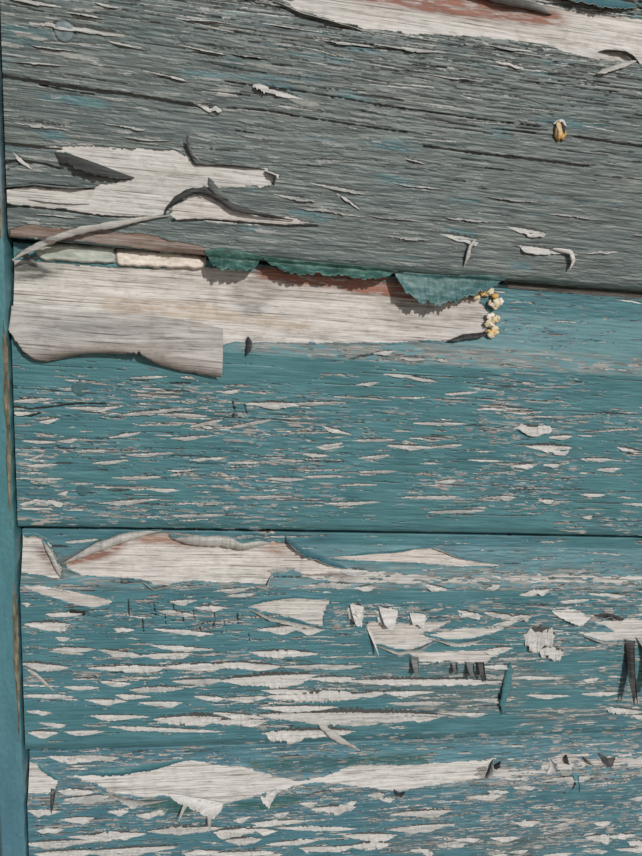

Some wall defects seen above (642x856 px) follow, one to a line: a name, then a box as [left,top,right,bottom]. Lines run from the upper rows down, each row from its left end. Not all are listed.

peeling [36,22,152,51]
peeling [272,0,642,64]
peeling [252,83,298,99]
peeling [0,123,424,238]
peeling [2,260,507,525]
peeling [514,424,570,469]
peeling [581,458,618,472]
peeling [12,528,642,745]
peeling [28,748,642,856]